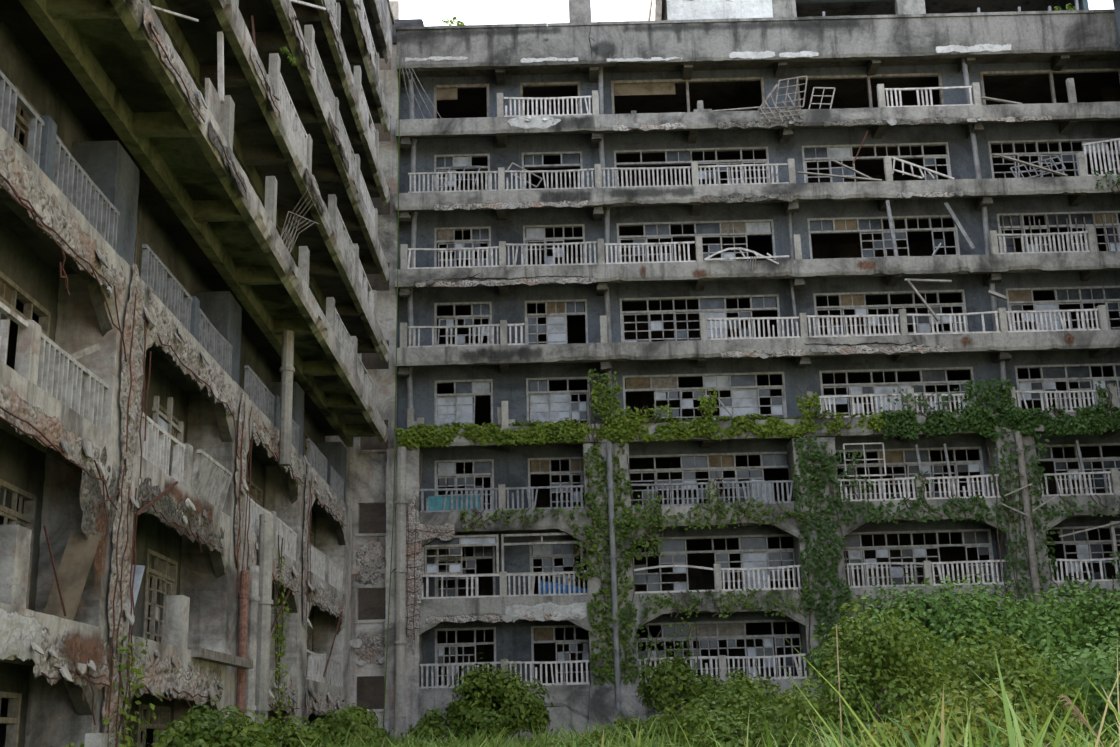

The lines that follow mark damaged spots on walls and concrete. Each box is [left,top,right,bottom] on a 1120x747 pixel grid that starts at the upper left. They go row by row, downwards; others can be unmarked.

spalling [0,146,347,747]
spalling [405,492,587,655]